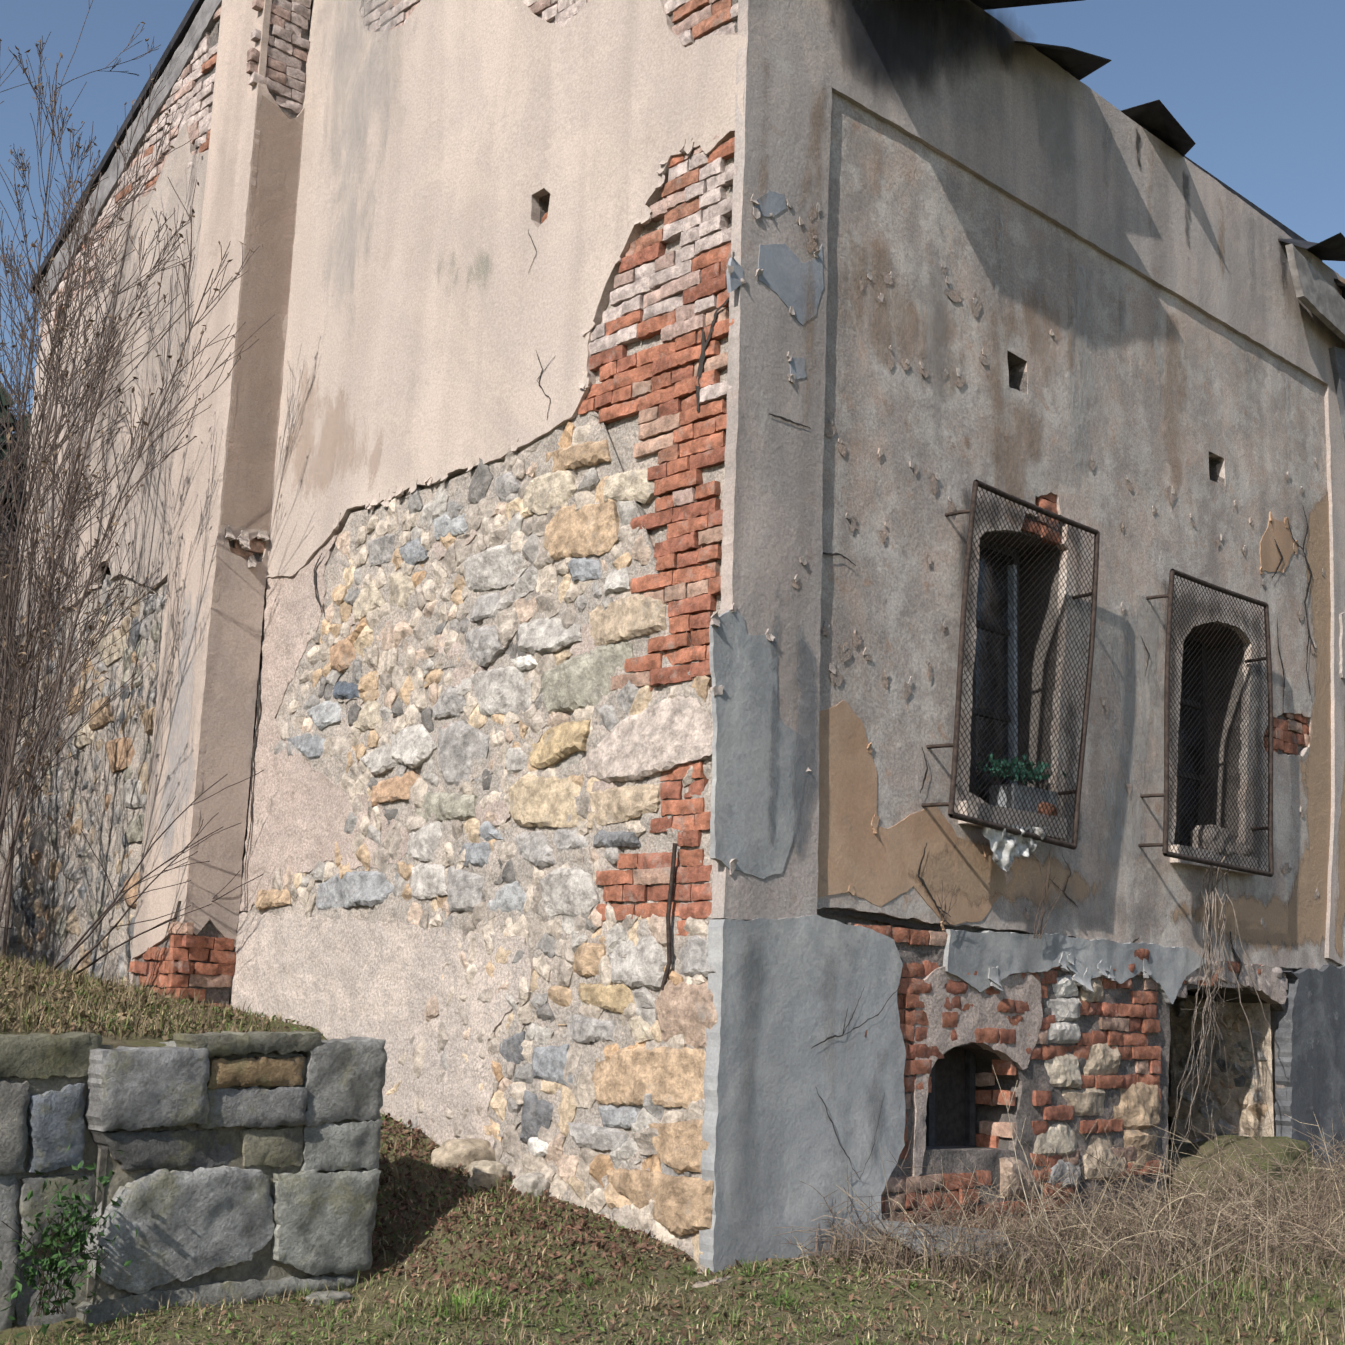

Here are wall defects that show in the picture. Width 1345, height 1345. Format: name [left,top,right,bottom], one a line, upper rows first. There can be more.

spalling [246,0,313,119]
spalling [360,0,421,42]
spalling [515,0,589,27]
spalling [662,0,738,47]
crack [536,351,556,418]
spalling [0,565,236,1012]
crack [244,661,260,911]
spalling [211,135,824,1263]
spalling [1263,713,1310,755]
spalling [845,921,1288,1246]